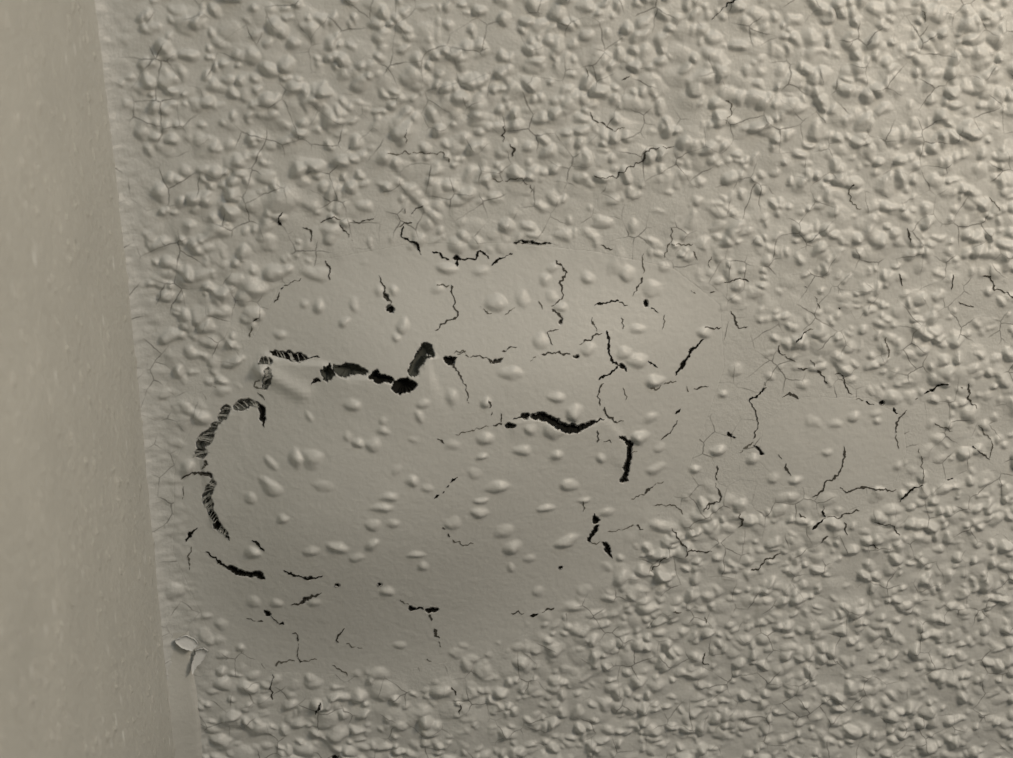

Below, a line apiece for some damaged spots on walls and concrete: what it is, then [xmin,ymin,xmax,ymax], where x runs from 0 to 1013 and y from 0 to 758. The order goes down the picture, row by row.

crack [984,275,1013,298]
crack [182,206,749,700]
crack [727,384,798,475]
crack [778,287,993,549]